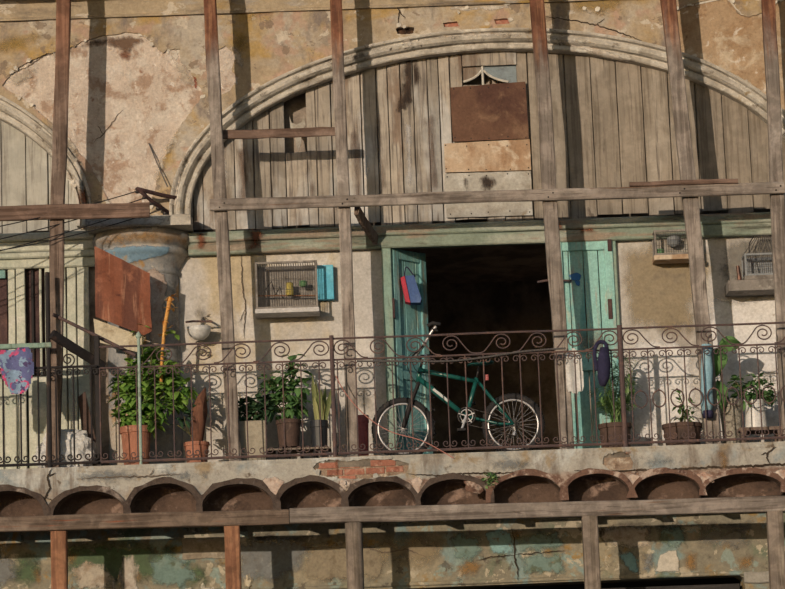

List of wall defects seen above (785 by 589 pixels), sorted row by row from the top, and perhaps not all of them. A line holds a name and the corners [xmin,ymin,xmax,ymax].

crack [546,16,641,41]
crack [679,0,743,15]
flaking render [3,52,55,126]
flaking render [219,46,243,94]
water stain [398,60,419,112]
flaking render [66,33,205,230]
crack [239,255,247,338]
flaking render [314,455,422,493]
spalling [603,450,641,485]
crack [480,528,564,579]